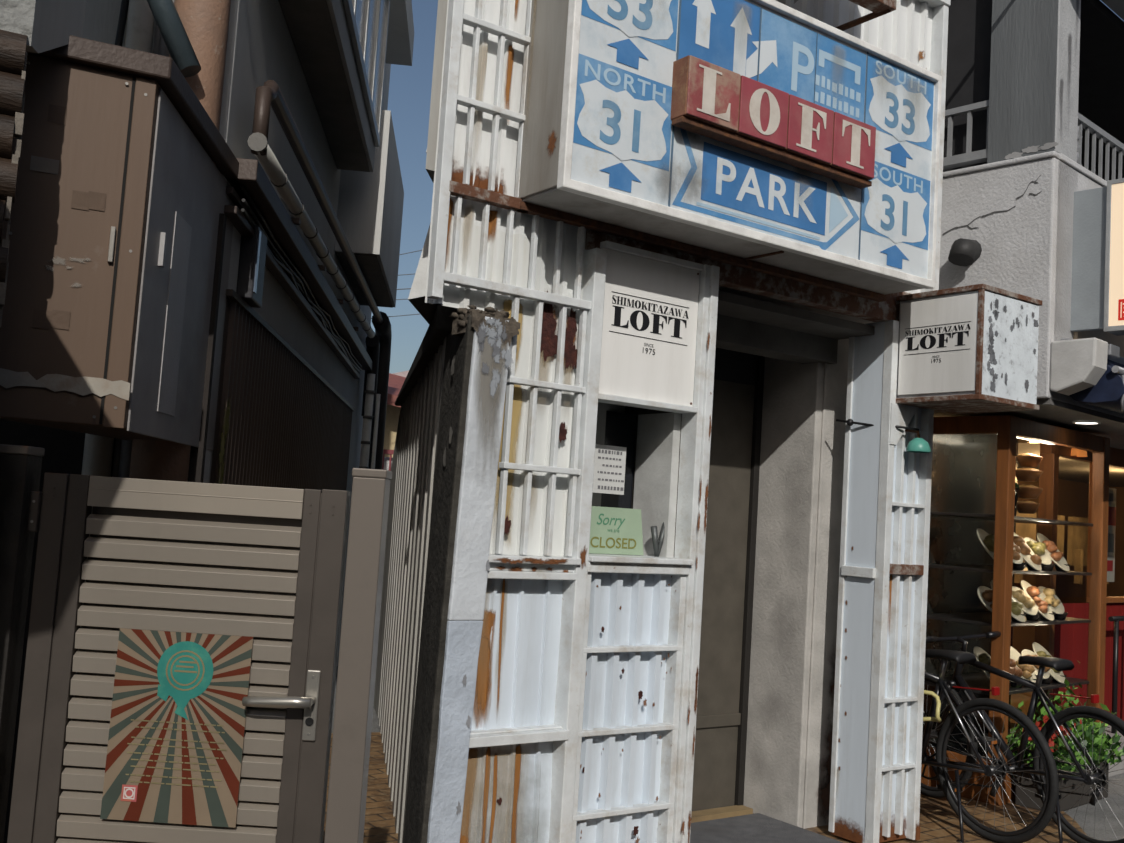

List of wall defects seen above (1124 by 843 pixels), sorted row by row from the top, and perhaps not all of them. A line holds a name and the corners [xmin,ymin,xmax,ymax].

crack [943,175,1041,235]
peeling [449,305,520,397]
rust [697,481,708,533]
rust [474,548,587,715]
rust [687,668,698,755]
rust [460,747,497,843]
rust [511,744,521,843]